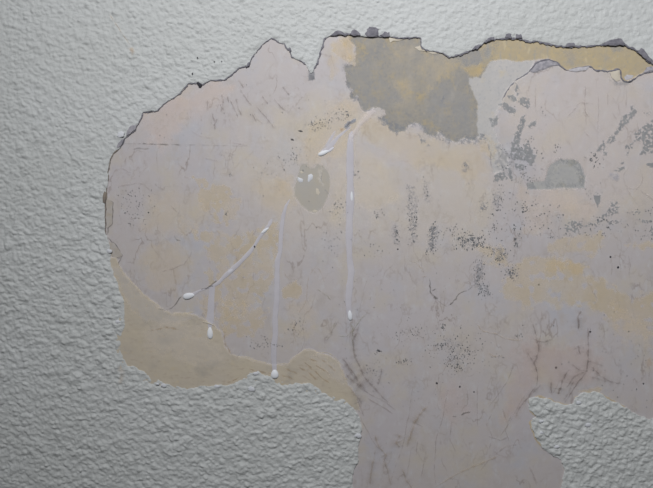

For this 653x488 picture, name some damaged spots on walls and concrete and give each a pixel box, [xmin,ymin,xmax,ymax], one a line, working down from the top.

peeling [103,27,653,488]
damp [425,192,560,298]